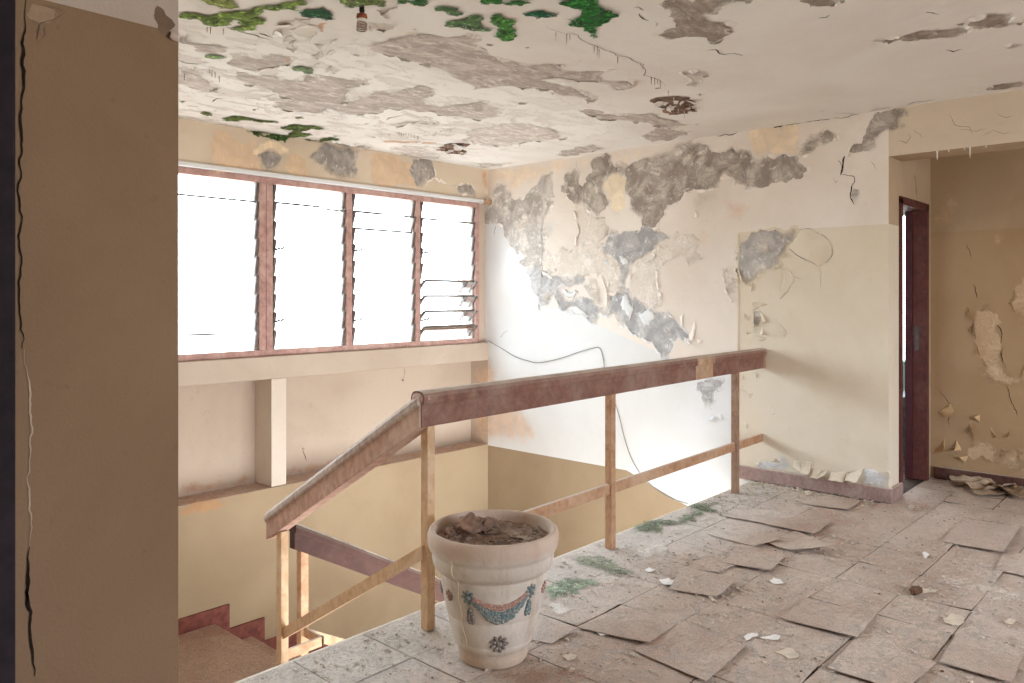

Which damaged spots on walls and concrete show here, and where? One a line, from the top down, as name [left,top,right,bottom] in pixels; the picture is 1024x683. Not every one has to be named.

flaking render [873,13,1024,44]
flaking render [986,81,1024,90]
flaking render [170,0,909,360]
crack [833,156,876,204]
crack [17,0,64,676]
flaking render [967,303,1024,393]
flaking render [695,377,725,421]
flaking render [934,415,1024,473]
peeling [739,455,892,495]
peeling [645,568,674,585]
peeling [943,614,966,625]
peeling [744,633,799,659]